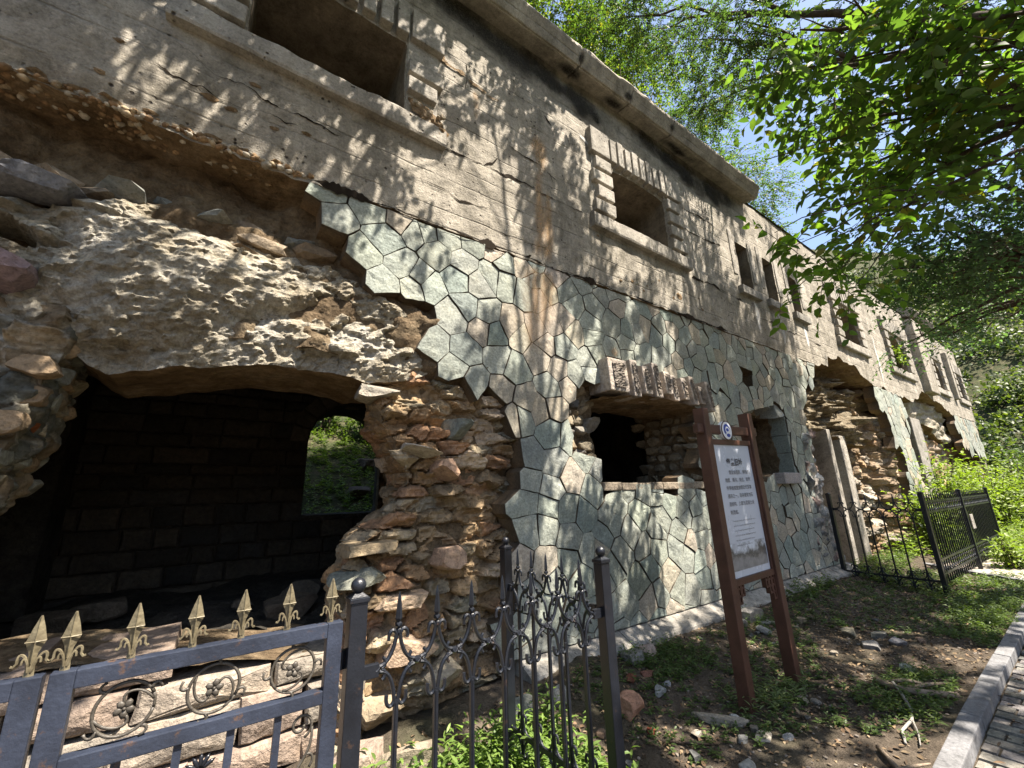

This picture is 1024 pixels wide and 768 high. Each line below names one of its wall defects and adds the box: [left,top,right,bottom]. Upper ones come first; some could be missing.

crack [156,39,340,136]
spalling [903,400,951,445]
spalling [802,375,877,569]